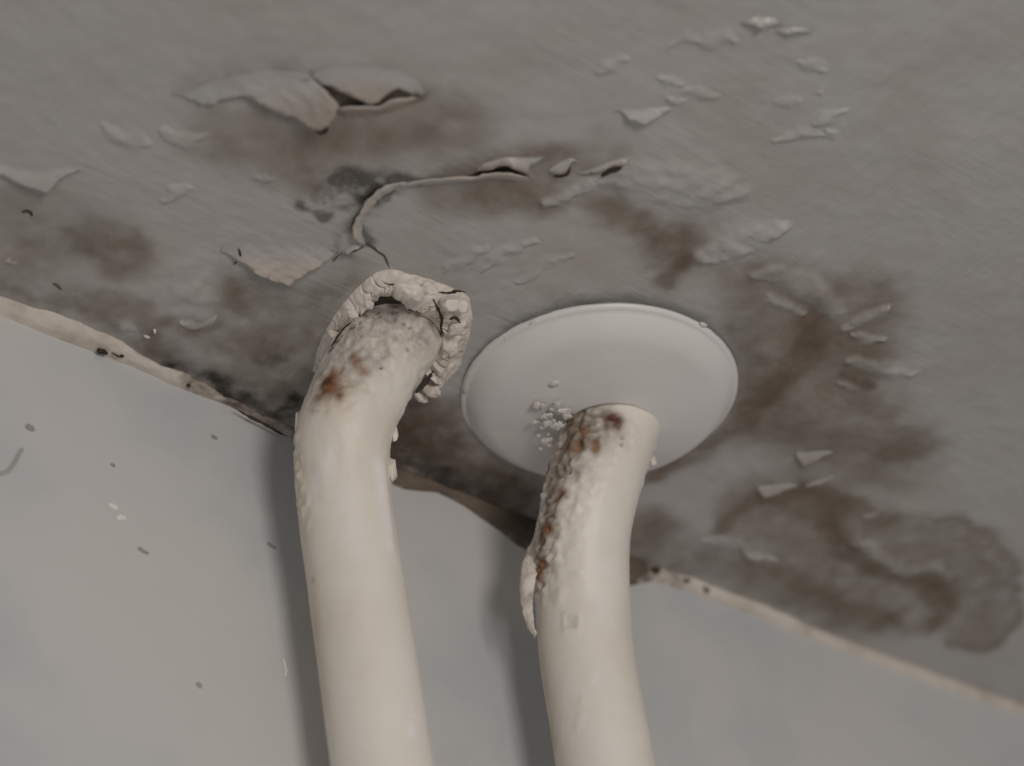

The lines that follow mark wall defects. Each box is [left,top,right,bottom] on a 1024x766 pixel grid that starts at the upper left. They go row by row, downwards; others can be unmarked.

peeling [171,60,430,135]
peeling [0,164,83,194]
crack [394,155,629,192]
mould [329,168,419,245]
peeling [220,232,362,287]
hole [374,296,402,306]
mould [207,372,250,402]
rust [321,370,342,399]
rust [607,413,622,425]
leakage [391,433,507,503]
peeling [519,537,538,638]
rust [536,560,546,580]